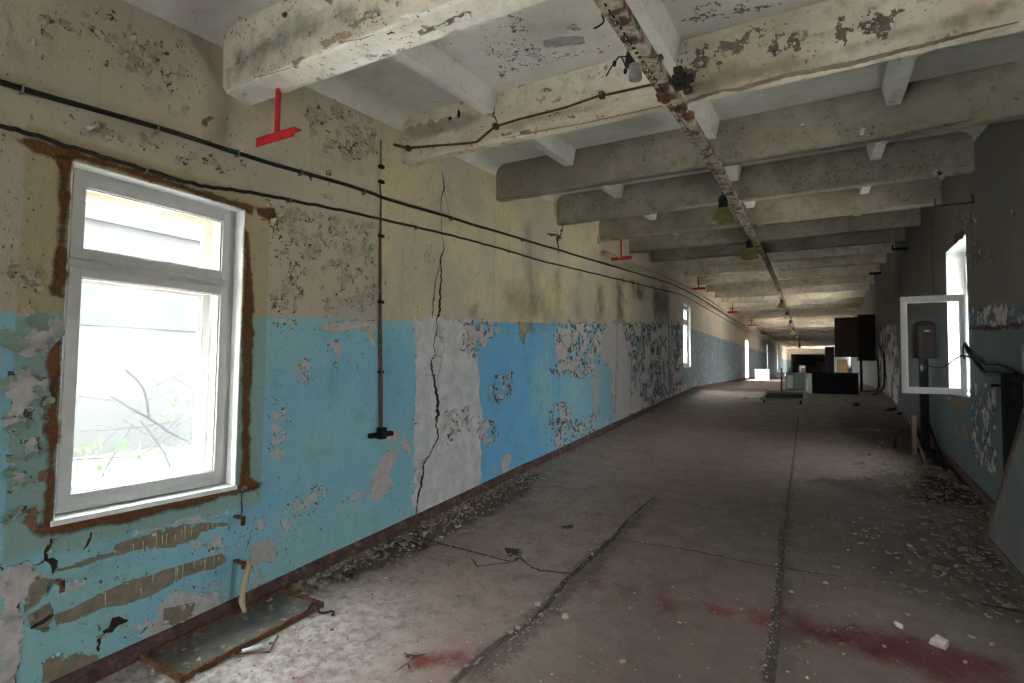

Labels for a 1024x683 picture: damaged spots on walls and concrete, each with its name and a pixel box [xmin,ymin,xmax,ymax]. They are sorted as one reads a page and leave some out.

peeling [347,9,380,28]
peeling [418,11,472,36]
spalling [501,105,662,138]
spalling [685,21,1019,104]
peeling [261,199,380,368]
peeling [0,258,65,494]
peeling [340,315,514,513]
peeling [549,319,683,447]
crack [408,174,848,683]
peeling [947,382,997,477]
peeling [0,486,328,683]